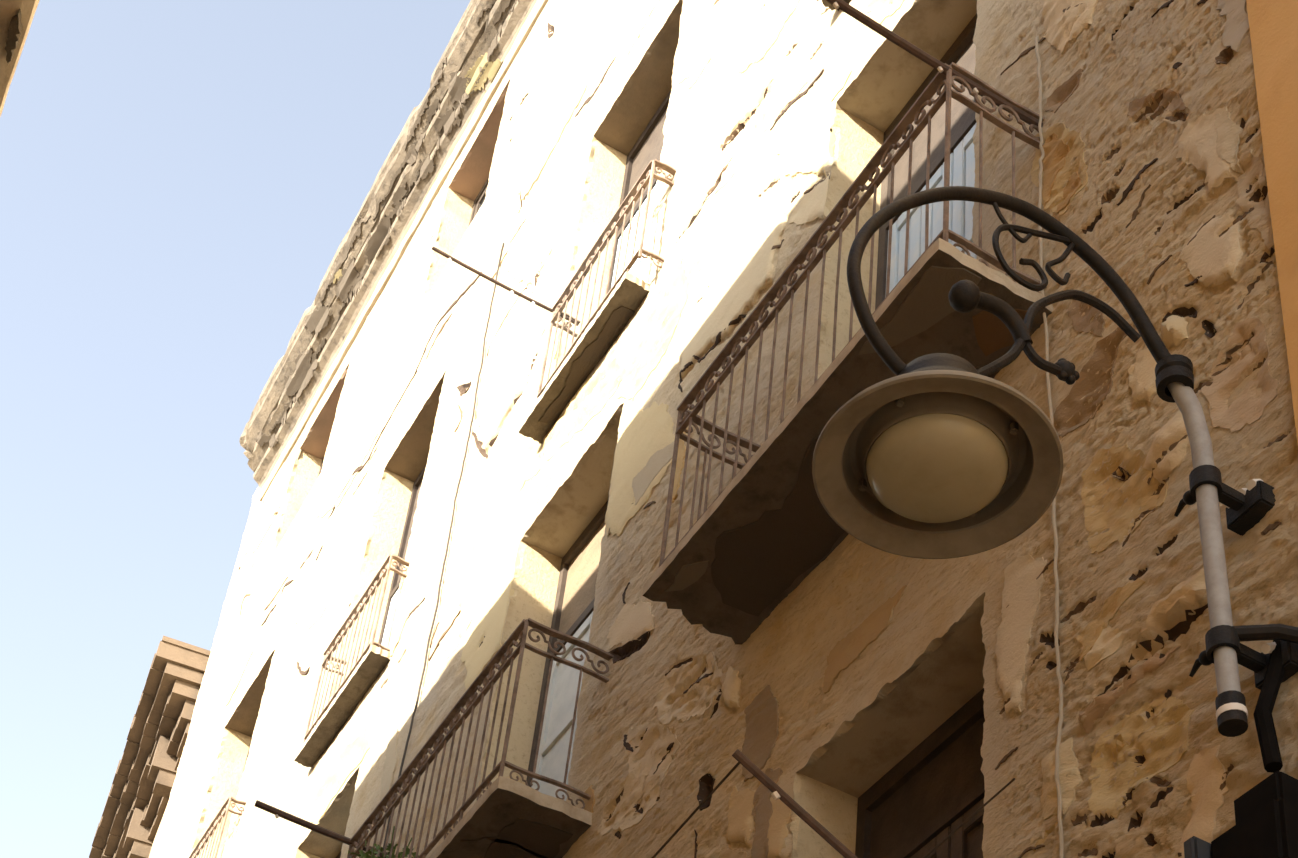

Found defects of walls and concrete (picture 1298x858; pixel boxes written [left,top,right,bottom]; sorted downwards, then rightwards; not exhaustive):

spalling [519,358,626,492]
spalling [309,728,370,824]